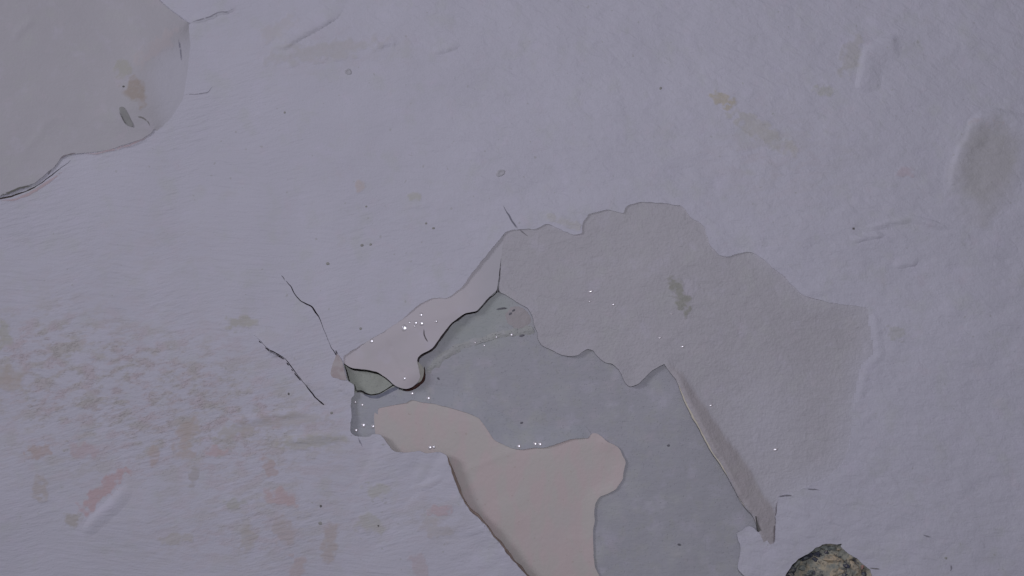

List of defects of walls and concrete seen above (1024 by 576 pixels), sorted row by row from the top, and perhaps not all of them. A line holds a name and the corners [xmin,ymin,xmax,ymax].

crack [282,276,337,355]
crack [259,341,324,405]
peeling [331,202,873,576]